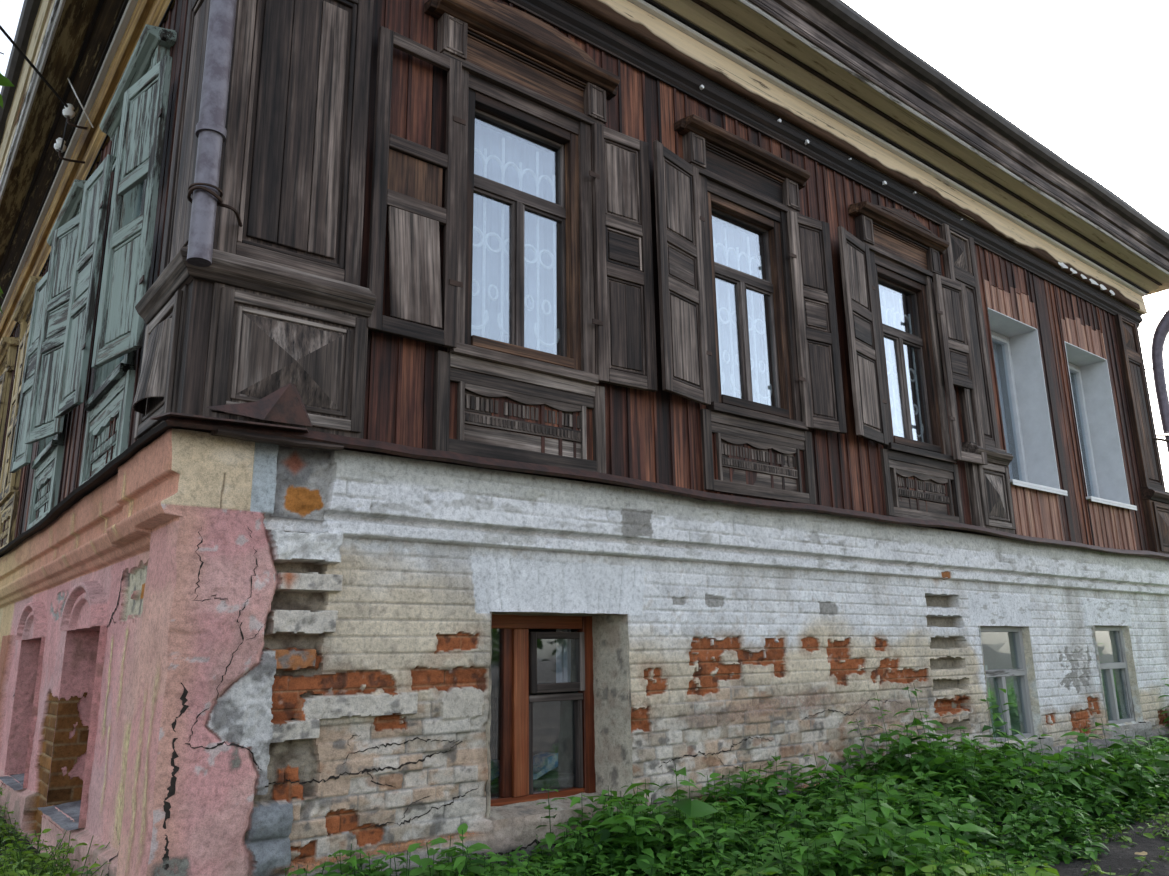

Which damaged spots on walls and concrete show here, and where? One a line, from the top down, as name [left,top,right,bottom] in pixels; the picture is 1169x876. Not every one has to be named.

spalling [207,445,489,801]
crack [162,527,479,870]
spalling [631,667,669,733]
spalling [687,637,788,696]
spalling [801,636,929,685]
spalling [934,694,972,716]
peeling [1045,652,1101,734]
spalling [22,689,89,835]
peeling [153,858,189,876]
spalling [290,808,387,869]